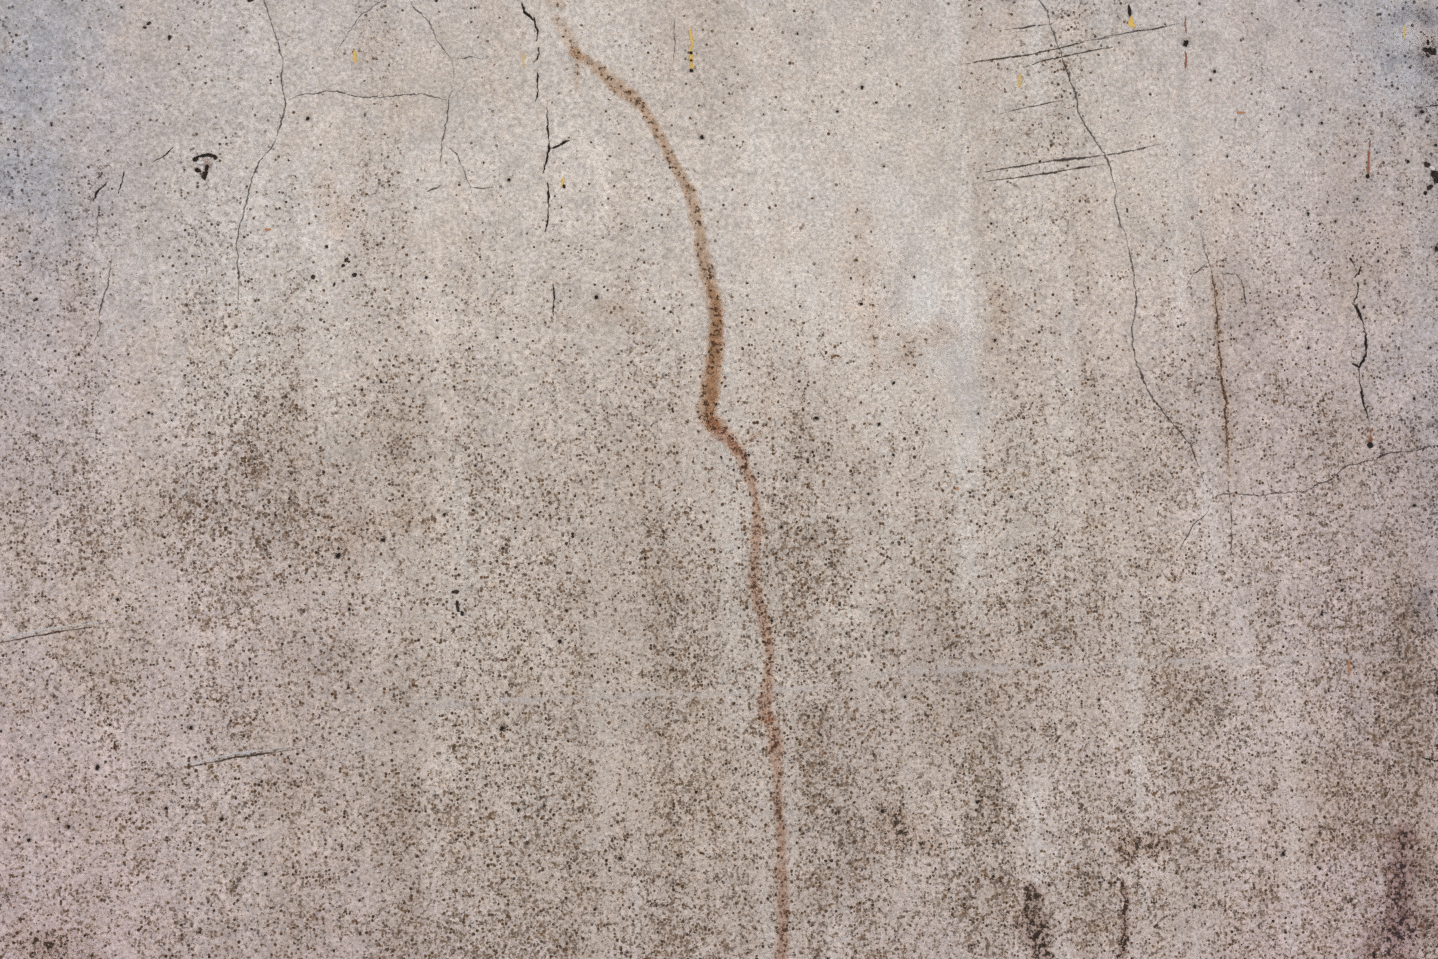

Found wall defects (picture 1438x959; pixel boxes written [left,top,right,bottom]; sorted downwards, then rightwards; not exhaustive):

crack [236,0,493,308]
crack [521,3,570,232]
corrosion [556,2,760,481]
crack [1039,0,1438,555]
corrosion [749,498,781,753]
leakage [1017,883,1055,959]
leakage [1117,882,1134,959]
leakage [1360,823,1438,959]